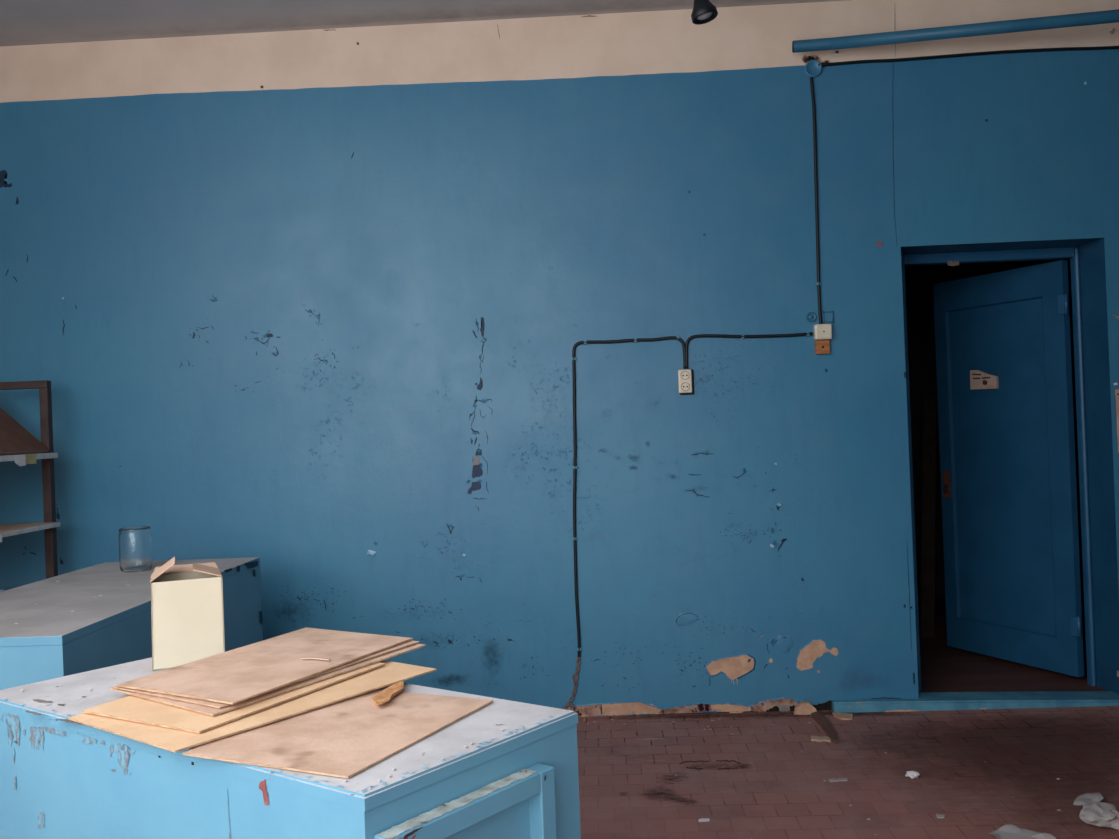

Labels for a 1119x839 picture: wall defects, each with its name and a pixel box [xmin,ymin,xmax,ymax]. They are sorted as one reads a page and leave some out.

peeling [467,317,493,524]
spalling [567,642,832,717]
spalling [665,616,839,687]